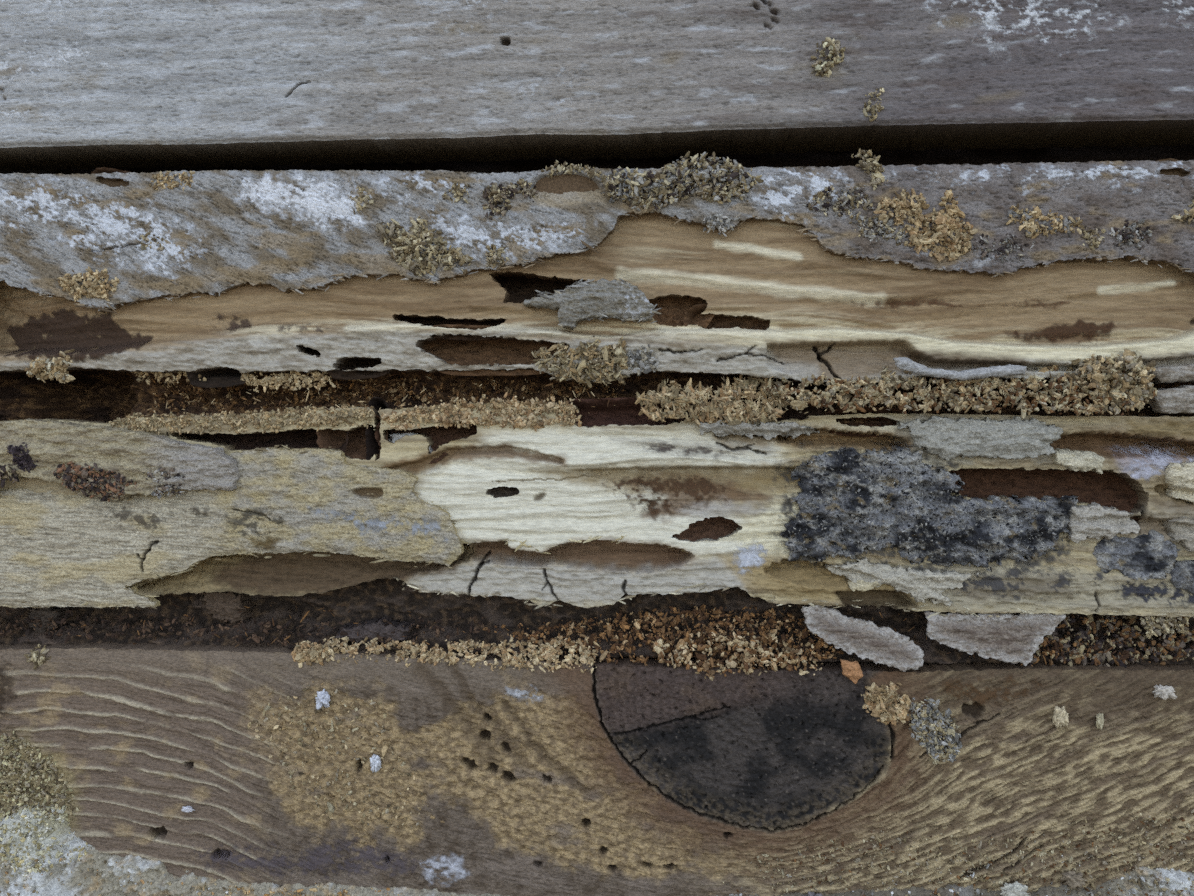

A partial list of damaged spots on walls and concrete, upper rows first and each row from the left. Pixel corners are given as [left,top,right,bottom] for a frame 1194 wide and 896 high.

peeling [522,278,661,330]
peeling [698,420,820,440]
peeling [897,416,1105,474]
peeling [1067,502,1141,543]